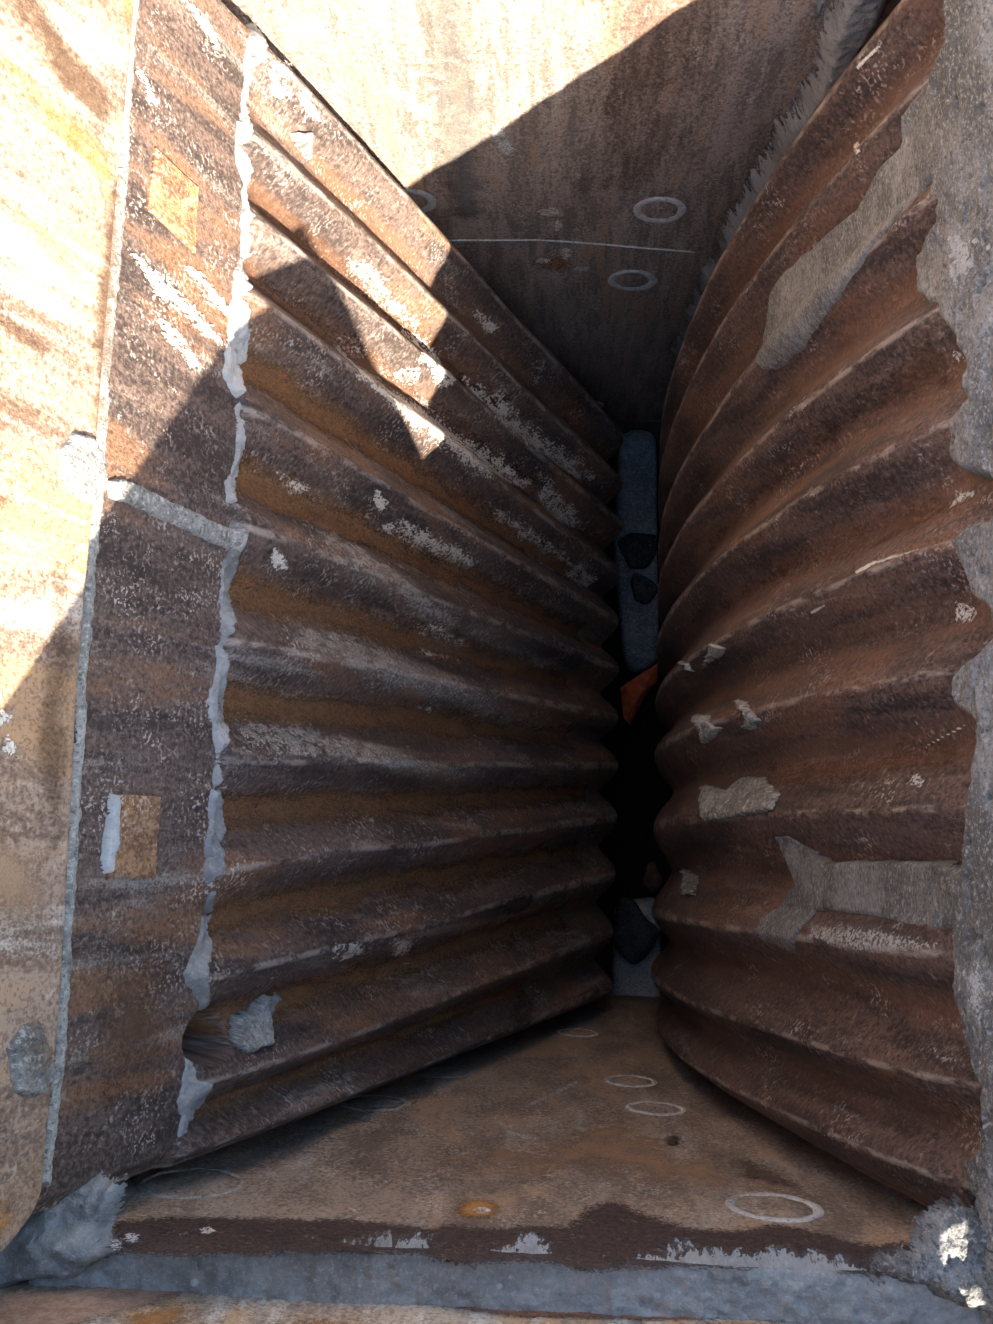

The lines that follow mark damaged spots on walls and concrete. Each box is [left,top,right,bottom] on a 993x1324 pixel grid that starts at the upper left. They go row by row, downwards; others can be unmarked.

corrosion [37,97,114,200]
corrosion [249,187,508,408]
corrosion [244,262,545,502]
corrosion [238,344,575,580]
corrosion [235,456,586,641]
corrosion [228,561,573,692]
corrosion [218,680,575,750]
corrosion [222,783,588,833]
corrosion [185,904,566,1035]
corrosion [0,1285,189,1324]
leakage [0,1169,983,1324]
corrosion [456,1306,693,1321]